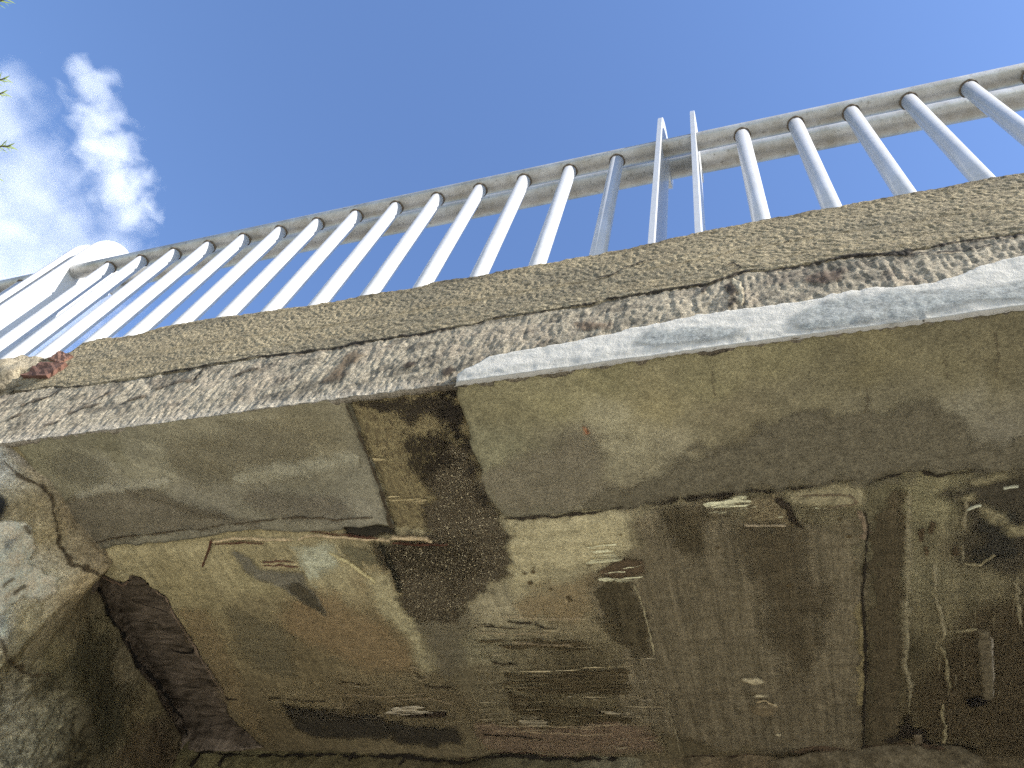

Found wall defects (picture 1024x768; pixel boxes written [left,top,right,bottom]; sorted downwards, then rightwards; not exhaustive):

crack [20,233,1024,406]
spalling [91,575,264,752]
crack [0,405,617,767]
water stain [228,402,1024,757]